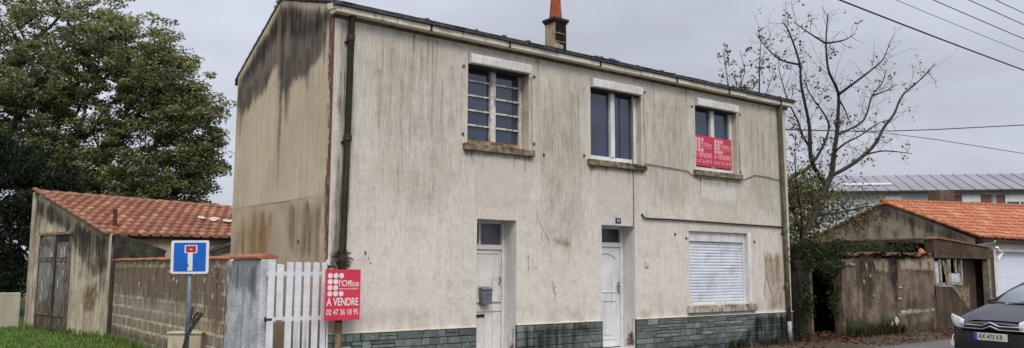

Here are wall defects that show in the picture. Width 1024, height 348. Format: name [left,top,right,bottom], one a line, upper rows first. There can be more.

leakage [238,5,329,118]
leakage [37,201,255,324]